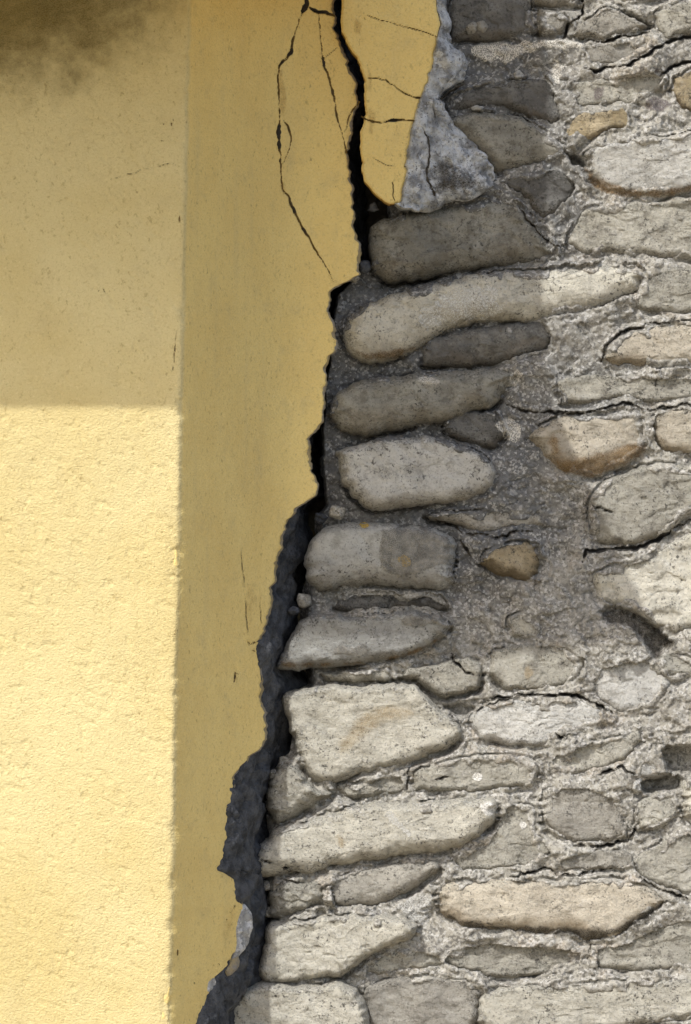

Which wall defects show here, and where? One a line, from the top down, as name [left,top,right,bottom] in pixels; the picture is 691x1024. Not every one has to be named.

damp [0,0,137,63]
crack [276,0,463,282]
peeling [394,0,495,213]
crack [308,497,325,537]
spalling [207,904,253,992]